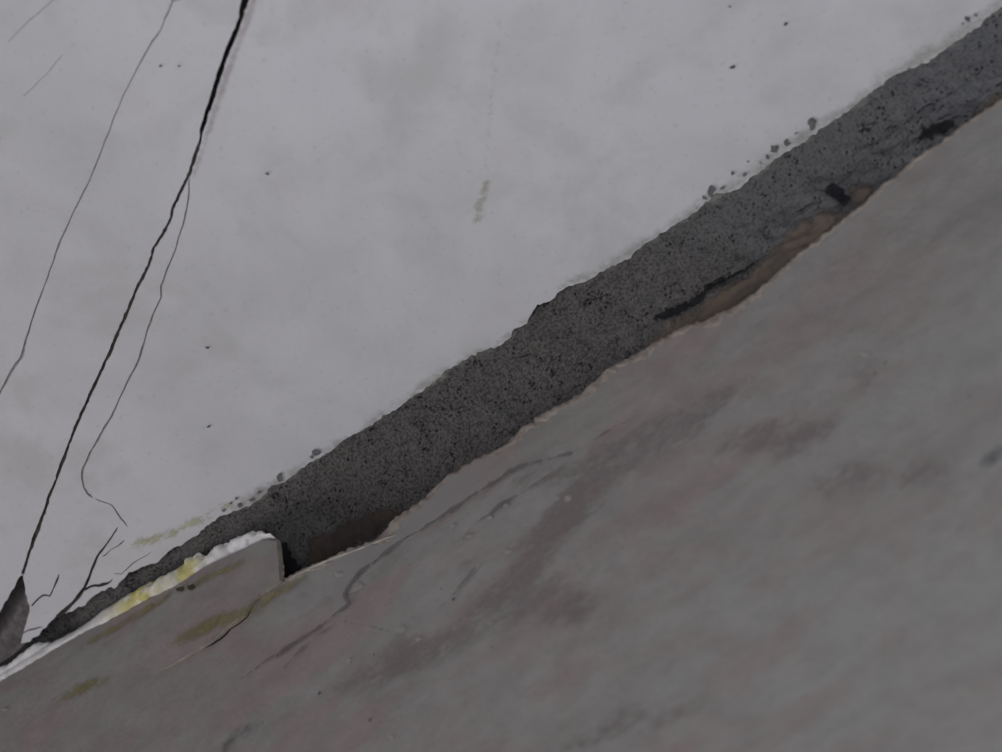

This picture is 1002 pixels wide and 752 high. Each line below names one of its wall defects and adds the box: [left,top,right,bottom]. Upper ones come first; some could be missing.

spalling [973,94,1002,118]
crack [0,0,255,634]
spalling [281,99,1002,583]
spalling [0,531,277,681]
crack [205,607,252,648]